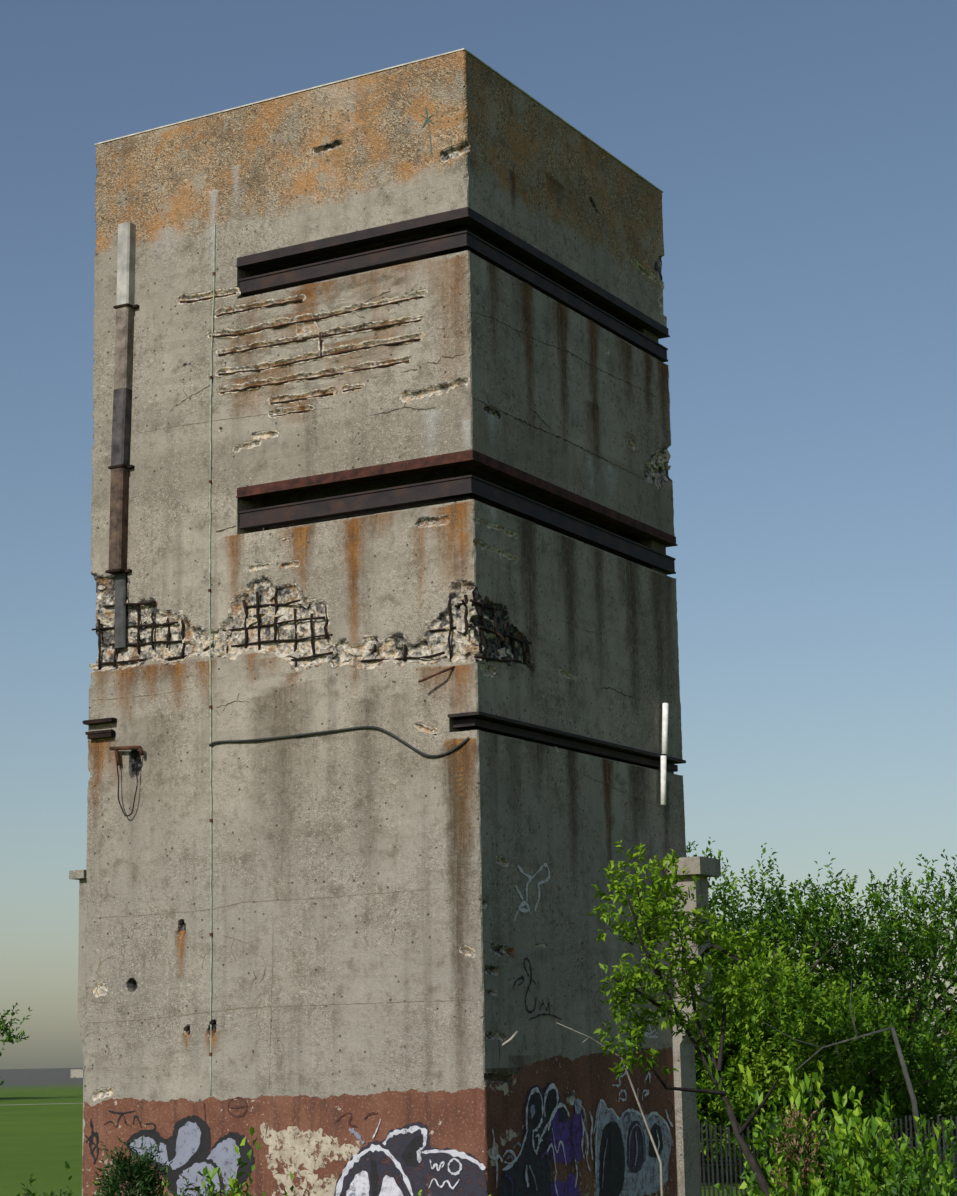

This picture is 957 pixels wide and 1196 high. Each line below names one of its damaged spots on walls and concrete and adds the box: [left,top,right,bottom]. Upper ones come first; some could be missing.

spalling [180,292,236,303]
spalling [209,296,424,394]
spalling [233,387,362,454]
spalling [399,376,470,403]
corrosion [624,341,668,424]
spalling [644,445,673,489]
corrosion [348,519,358,639]
spalling [89,560,535,683]
peeling [260,1123,361,1196]